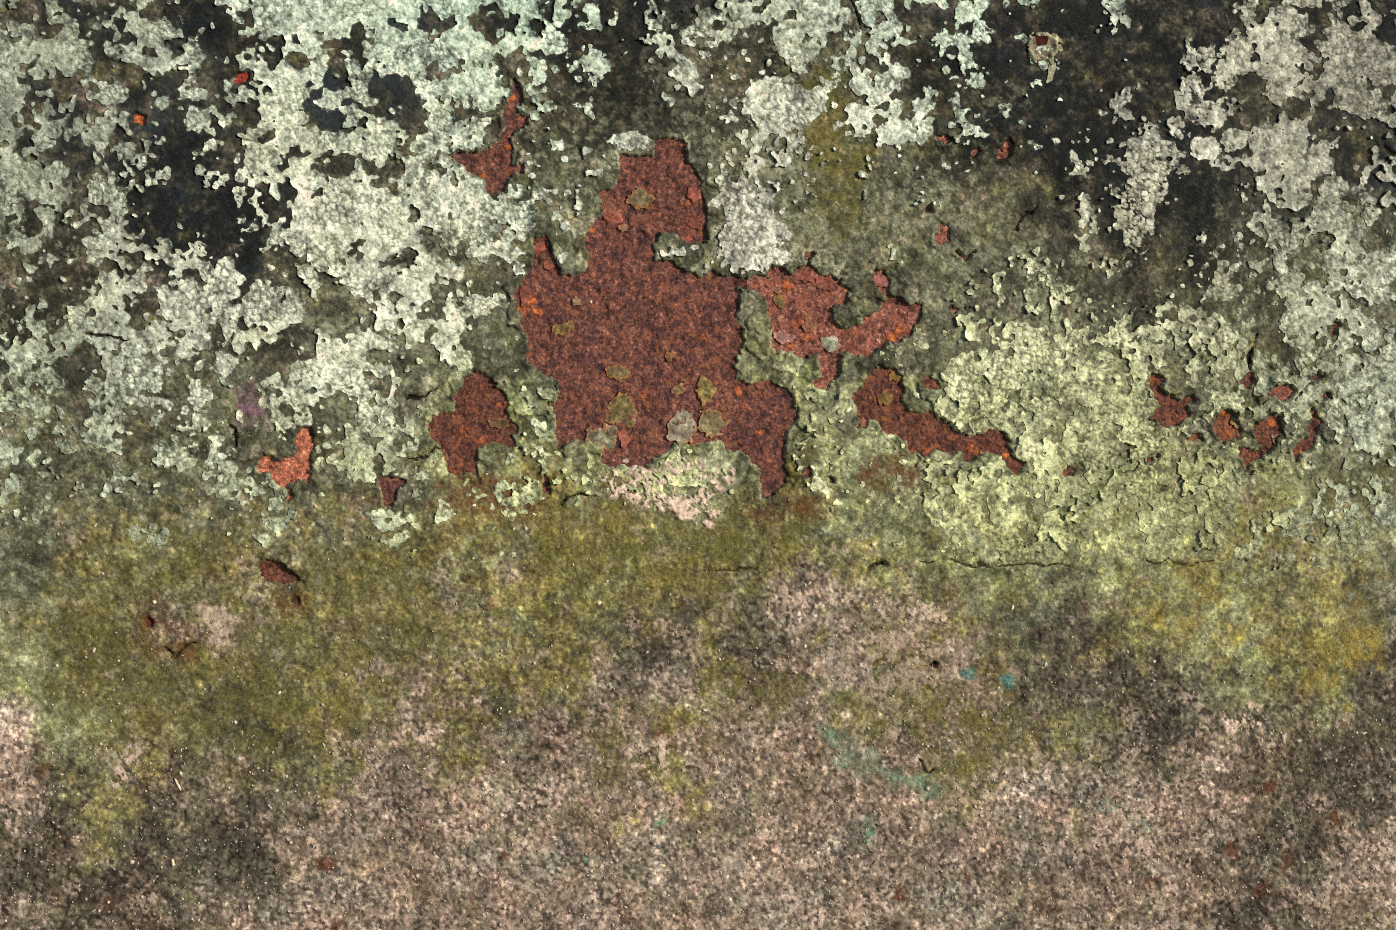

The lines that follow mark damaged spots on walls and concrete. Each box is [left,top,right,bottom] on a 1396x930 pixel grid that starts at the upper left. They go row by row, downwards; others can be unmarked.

rust [451,81,528,195]
peeling [0,0,1396,587]
rust [513,138,1024,498]
rust [428,370,521,477]
rust [1149,373,1197,428]
rust [1187,385,1294,467]
rust [257,428,314,500]
damp [875,595,947,623]
damp [112,744,141,787]
damp [413,723,445,749]
damp [626,736,670,787]
damp [1221,702,1301,752]